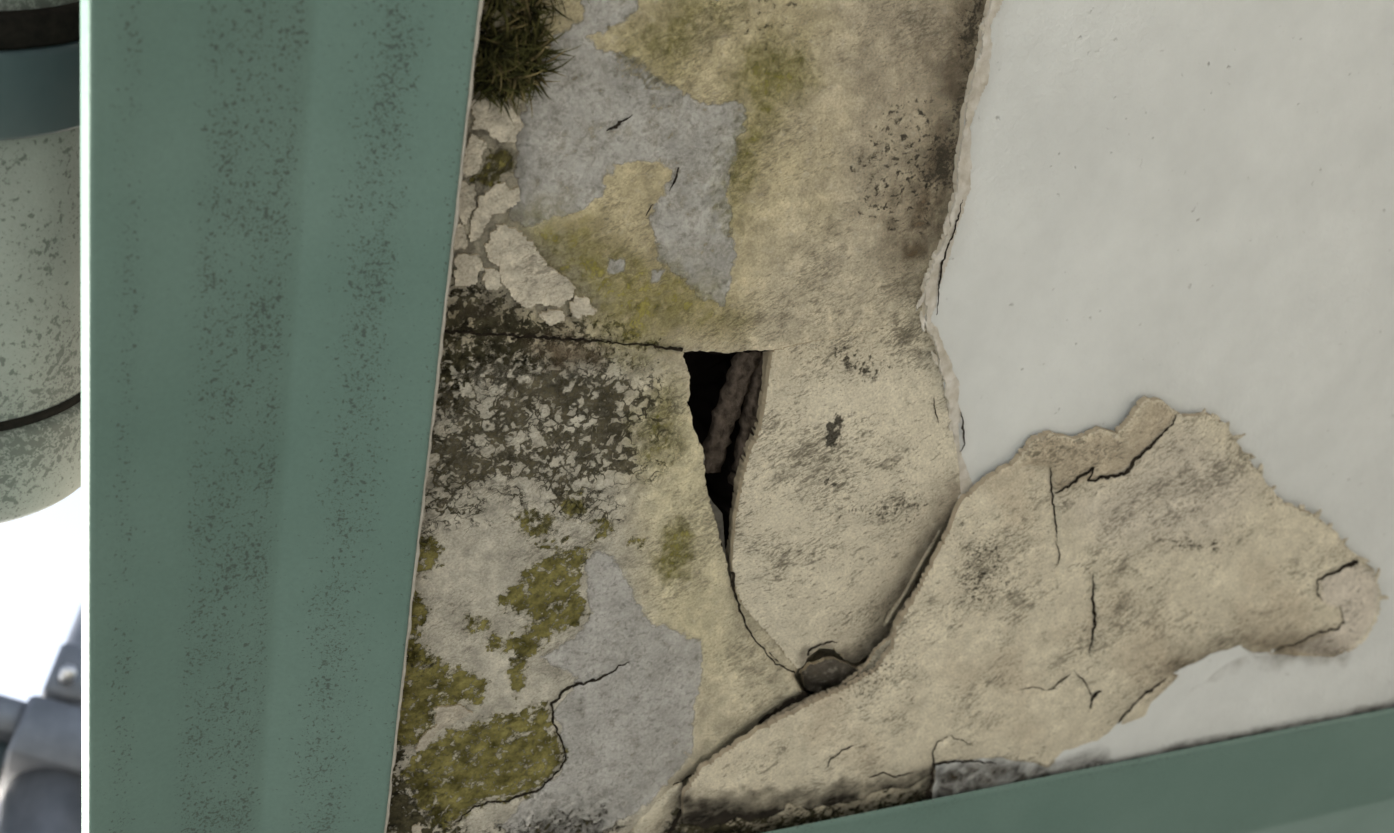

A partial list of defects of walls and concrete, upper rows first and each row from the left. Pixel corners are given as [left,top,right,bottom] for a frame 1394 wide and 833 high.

peeling [453,0,746,326]
peeling [943,204,956,236]
crack [936,200,963,315]
crack [1050,415,1176,565]
damp [386,738,467,833]
peeling [415,704,473,751]
crack [455,662,629,822]
damp [488,805,630,833]
crack [731,572,838,736]
damp [662,763,1053,833]
flaking render [499,396,1389,833]
crack [1021,574,1178,724]